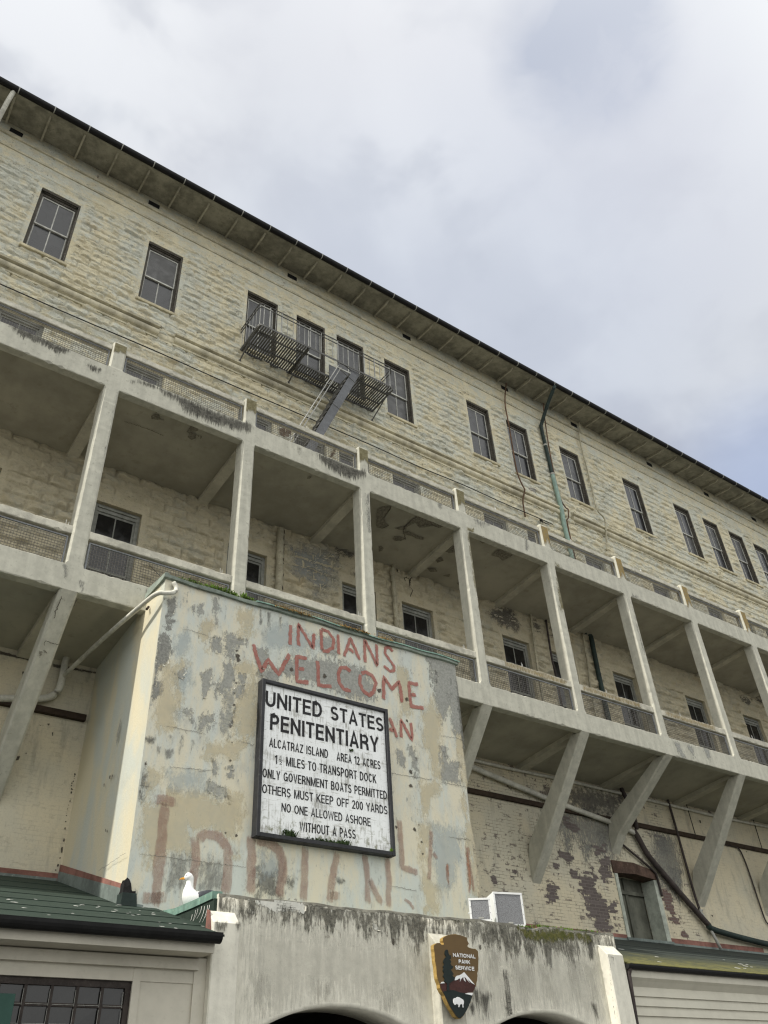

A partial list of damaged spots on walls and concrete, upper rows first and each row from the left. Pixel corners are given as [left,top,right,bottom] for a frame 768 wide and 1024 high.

damp [11,326,69,354]
damp [139,381,251,431]
spalling [376,506,442,541]
peeling [141,597,378,867]
flaking render [545,843,620,932]
flaking render [662,878,688,940]
damp [389,917,426,953]